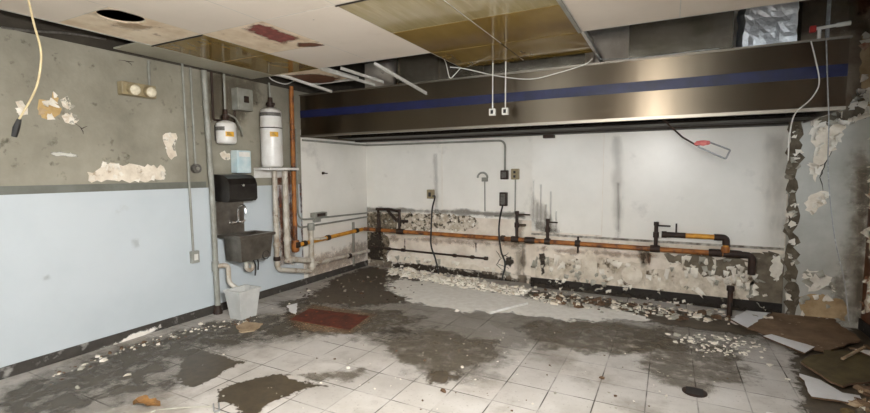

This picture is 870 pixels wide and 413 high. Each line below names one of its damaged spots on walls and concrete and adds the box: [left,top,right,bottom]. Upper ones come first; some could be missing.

damp [246,24,298,43]
peeling [15,91,80,125]
peeling [87,132,178,183]
peeling [530,32,870,322]
flaking render [367,211,517,282]